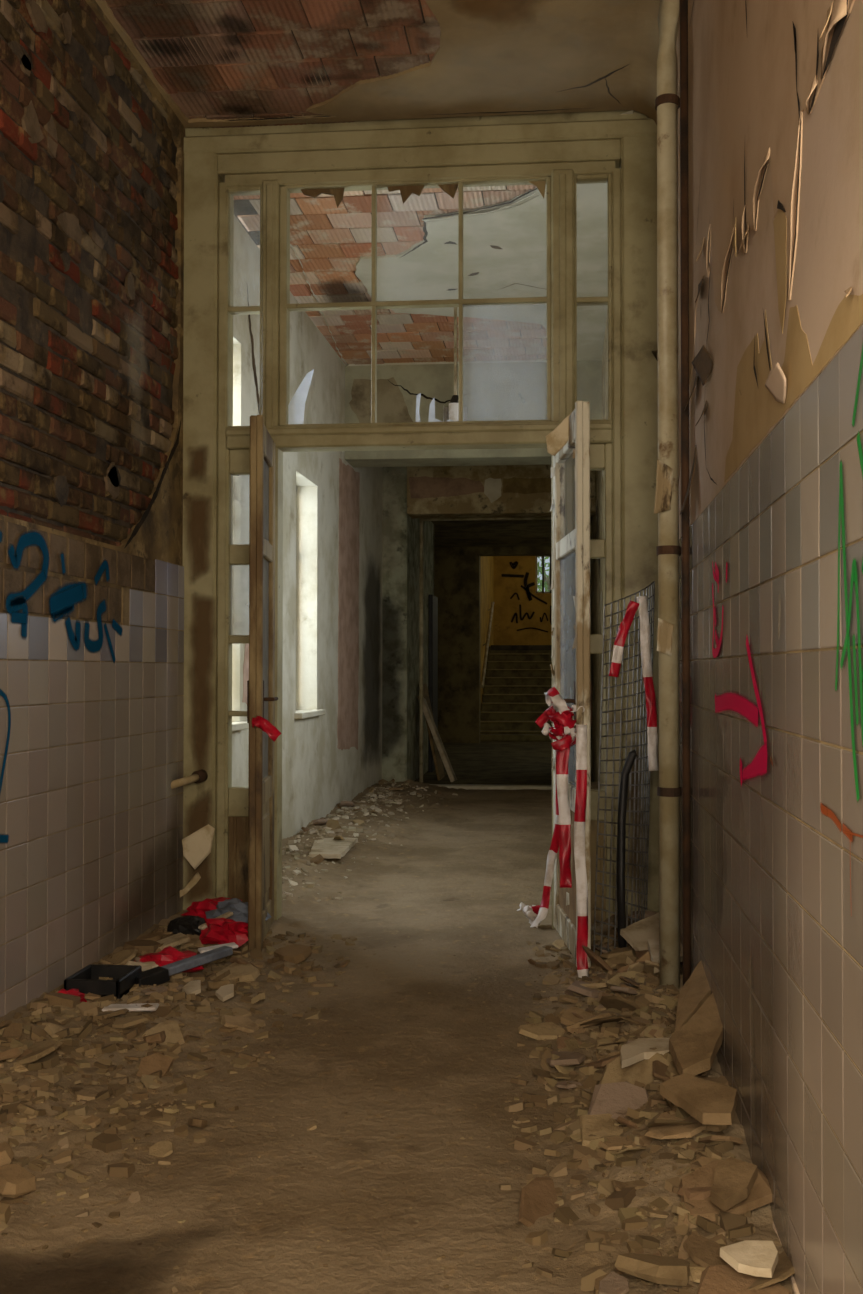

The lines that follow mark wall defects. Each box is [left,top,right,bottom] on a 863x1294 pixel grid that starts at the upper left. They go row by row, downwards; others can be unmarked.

spalling [0,0,441,622]
spalling [290,185,547,423]
peeling [654,0,863,515]
peeling [192,596,213,770]
spalling [337,458,400,754]